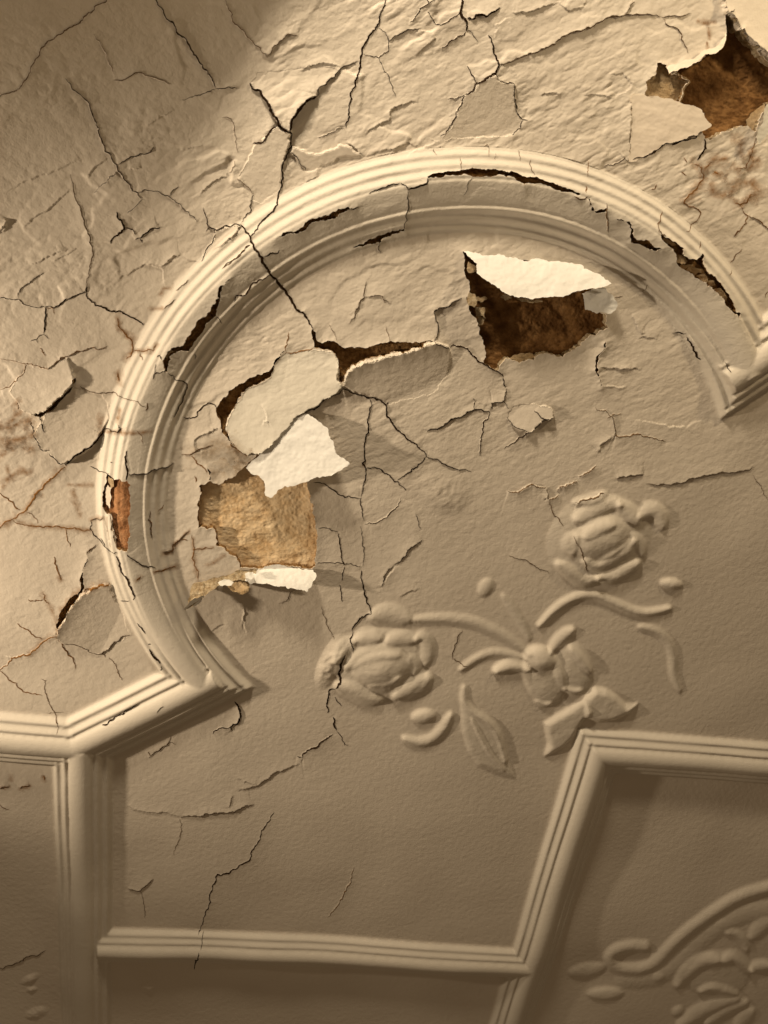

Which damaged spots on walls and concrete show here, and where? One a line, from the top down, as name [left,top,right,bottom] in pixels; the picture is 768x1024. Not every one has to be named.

spalling [629,15,768,162]
crack [0,0,768,766]
spalling [463,251,618,371]
spalling [102,474,131,552]
spalling [184,413,350,610]
crack [174,773,275,851]
crack [194,813,274,969]